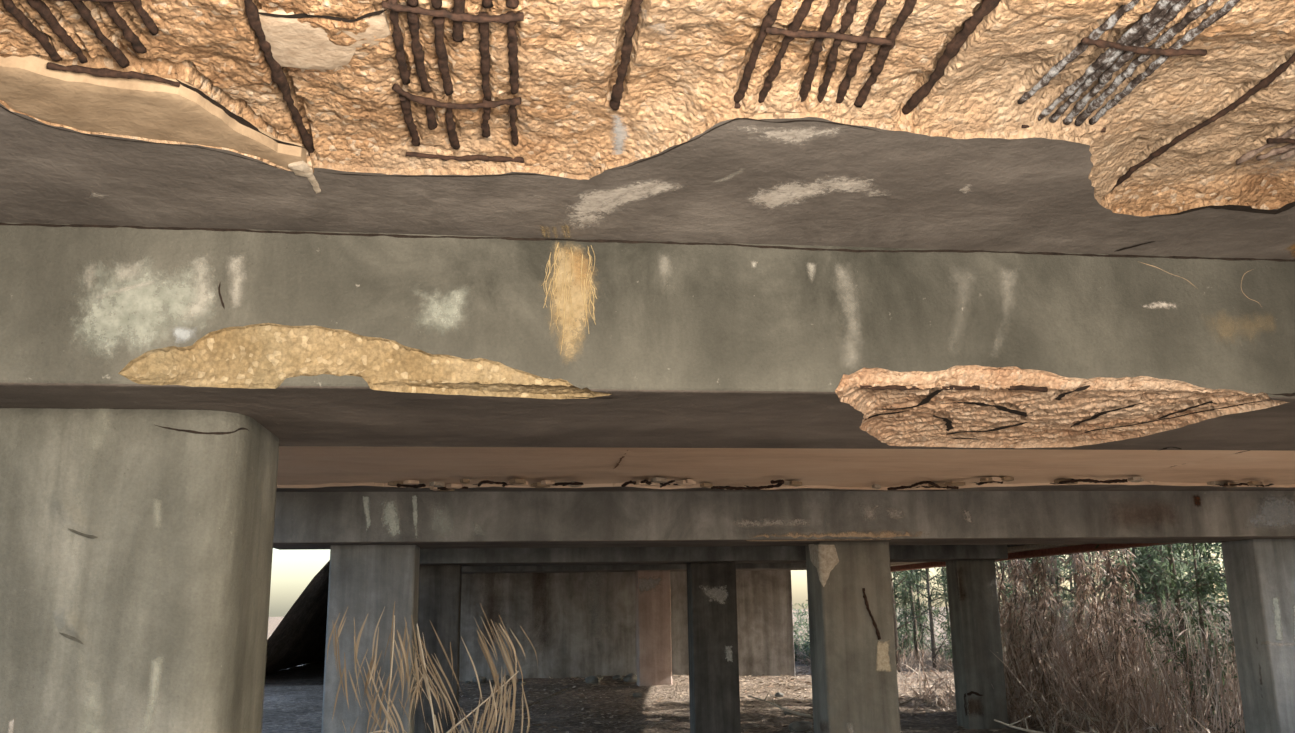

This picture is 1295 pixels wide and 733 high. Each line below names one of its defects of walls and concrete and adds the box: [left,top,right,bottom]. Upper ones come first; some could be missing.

spalling [0,0,1295,217]
water stain [569,179,679,228]
water stain [748,176,883,208]
water stain [84,268,210,346]
water stain [233,260,241,298]
spalling [118,323,611,399]
crack [156,425,249,435]
spalling [277,365,1295,491]